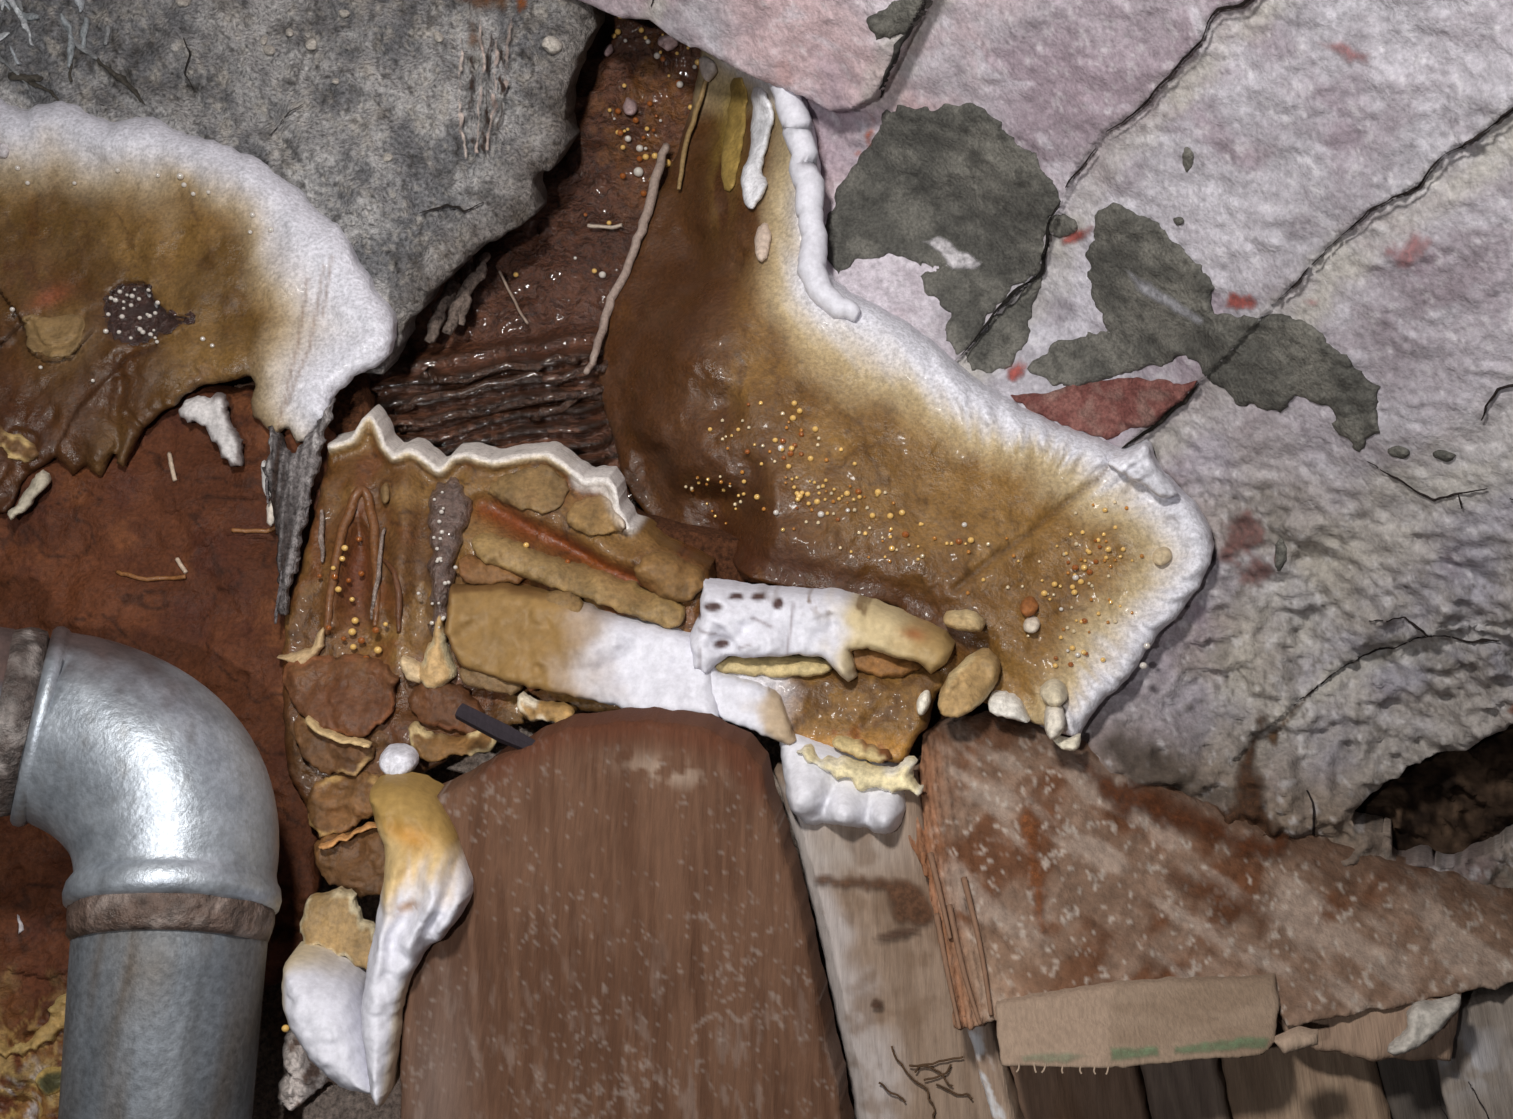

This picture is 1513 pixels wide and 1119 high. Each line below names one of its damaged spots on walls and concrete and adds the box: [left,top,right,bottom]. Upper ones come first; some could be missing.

crack [879,0,927,98]
leakage [102,283,196,346]
peeling [0,0,708,527]
peeling [1063,231,1086,243]
crack [960,0,1250,356]
peeling [1228,293,1255,308]
crack [1278,107,1513,300]
spalling [1009,365,1197,440]
leakage [370,527,386,619]
leakage [426,477,473,636]
spalling [1355,724,1513,854]
leakage [816,876,932,938]